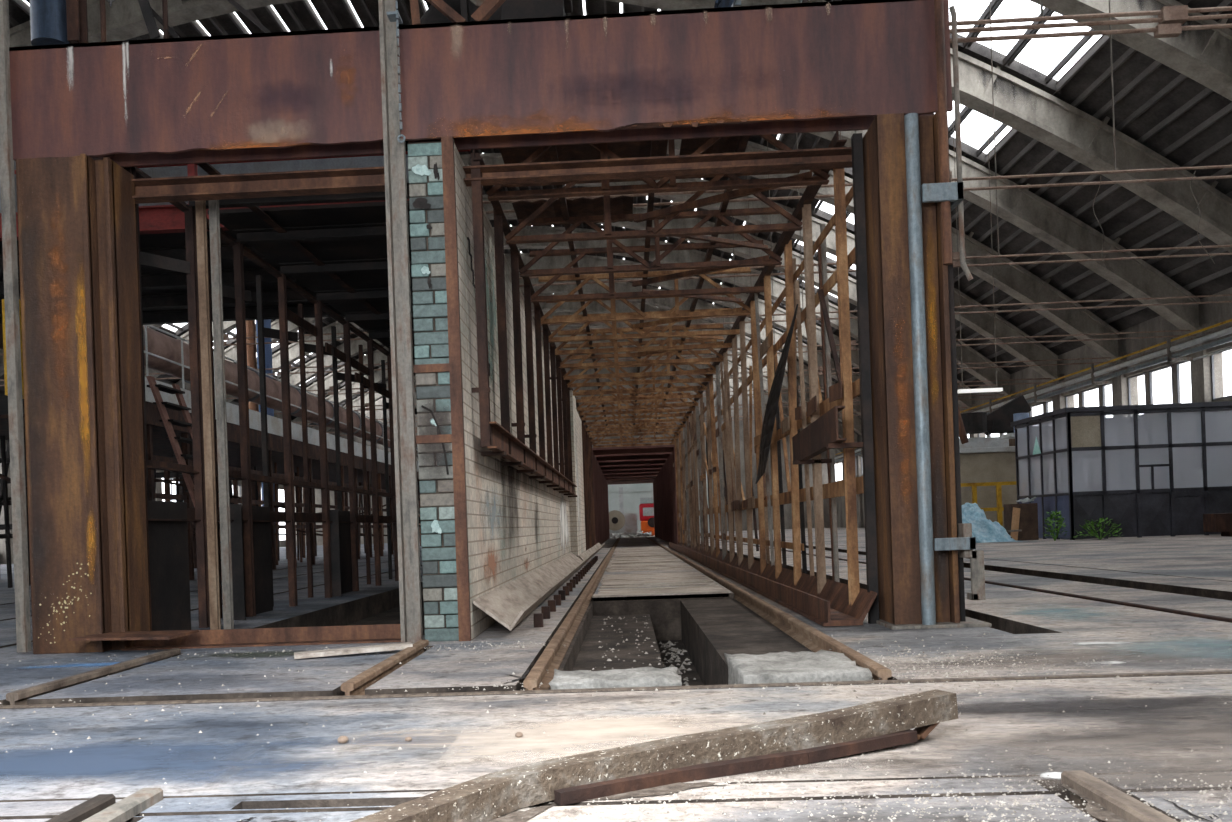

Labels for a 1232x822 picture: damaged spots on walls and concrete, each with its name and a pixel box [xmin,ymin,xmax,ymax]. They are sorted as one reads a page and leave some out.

corrosion [457,115,592,137]
corrosion [615,112,832,130]
corrosion [217,137,281,150]
corrosion [53,286,89,453]
crack [1164,799,1221,822]